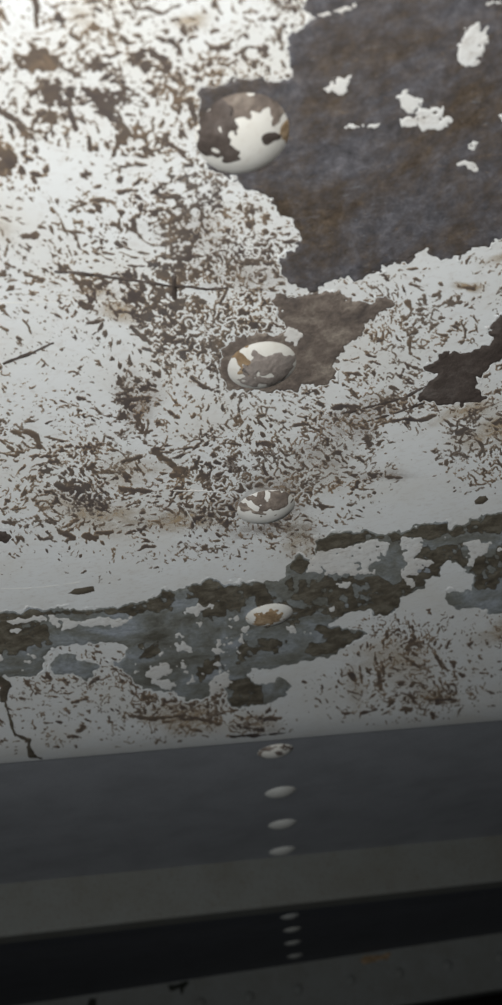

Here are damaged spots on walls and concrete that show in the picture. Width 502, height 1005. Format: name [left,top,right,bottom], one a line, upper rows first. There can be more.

crack [0,676,43,759]
peeling [0,0,502,754]